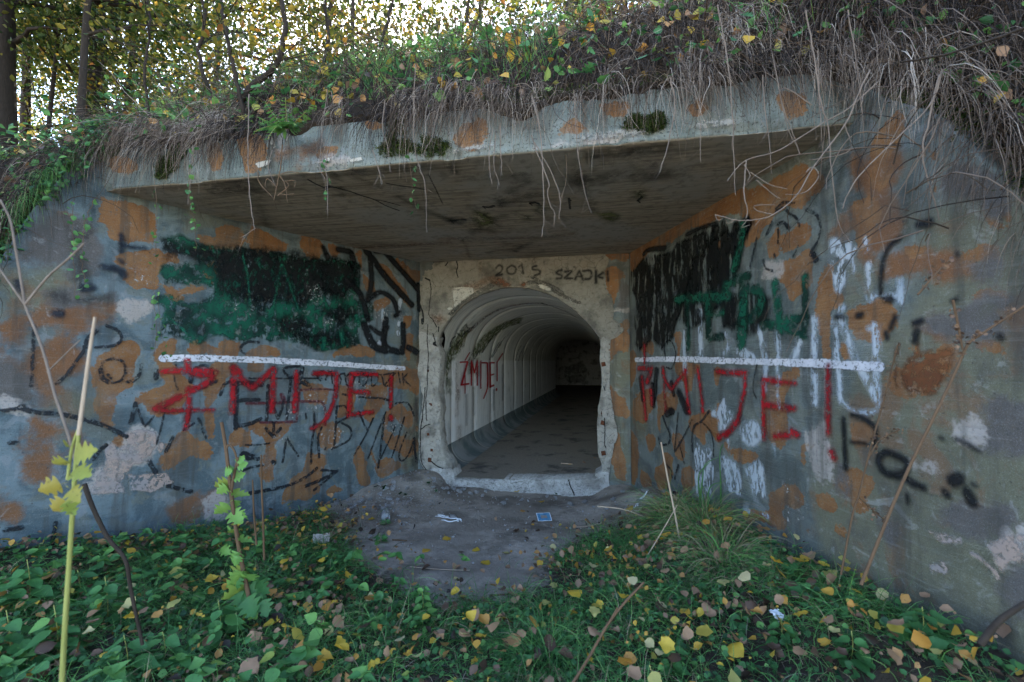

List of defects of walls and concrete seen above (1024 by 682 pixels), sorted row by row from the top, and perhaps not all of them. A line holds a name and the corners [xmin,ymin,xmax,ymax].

crack [308,175,443,211]
spalling [417,254,624,497]